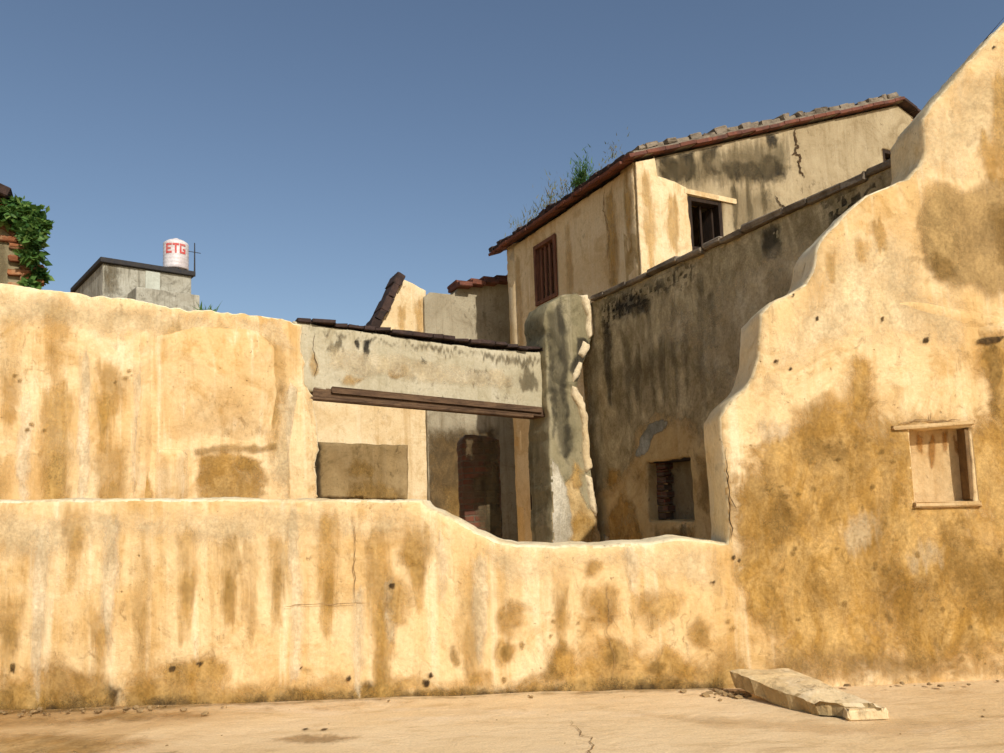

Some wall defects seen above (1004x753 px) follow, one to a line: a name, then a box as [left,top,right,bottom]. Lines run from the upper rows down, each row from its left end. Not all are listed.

crack [792,128,805,178]
water stain [918,77,1004,294]
flaking render [0,225,45,286]
water stain [572,135,892,494]
water stain [43,351,90,500]
water stain [197,444,275,498]
water stain [571,511,594,542]
water stain [609,495,641,588]
water stain [733,336,1004,676]
water stain [0,528,107,710]
water stain [126,590,437,706]
water stain [689,621,710,646]